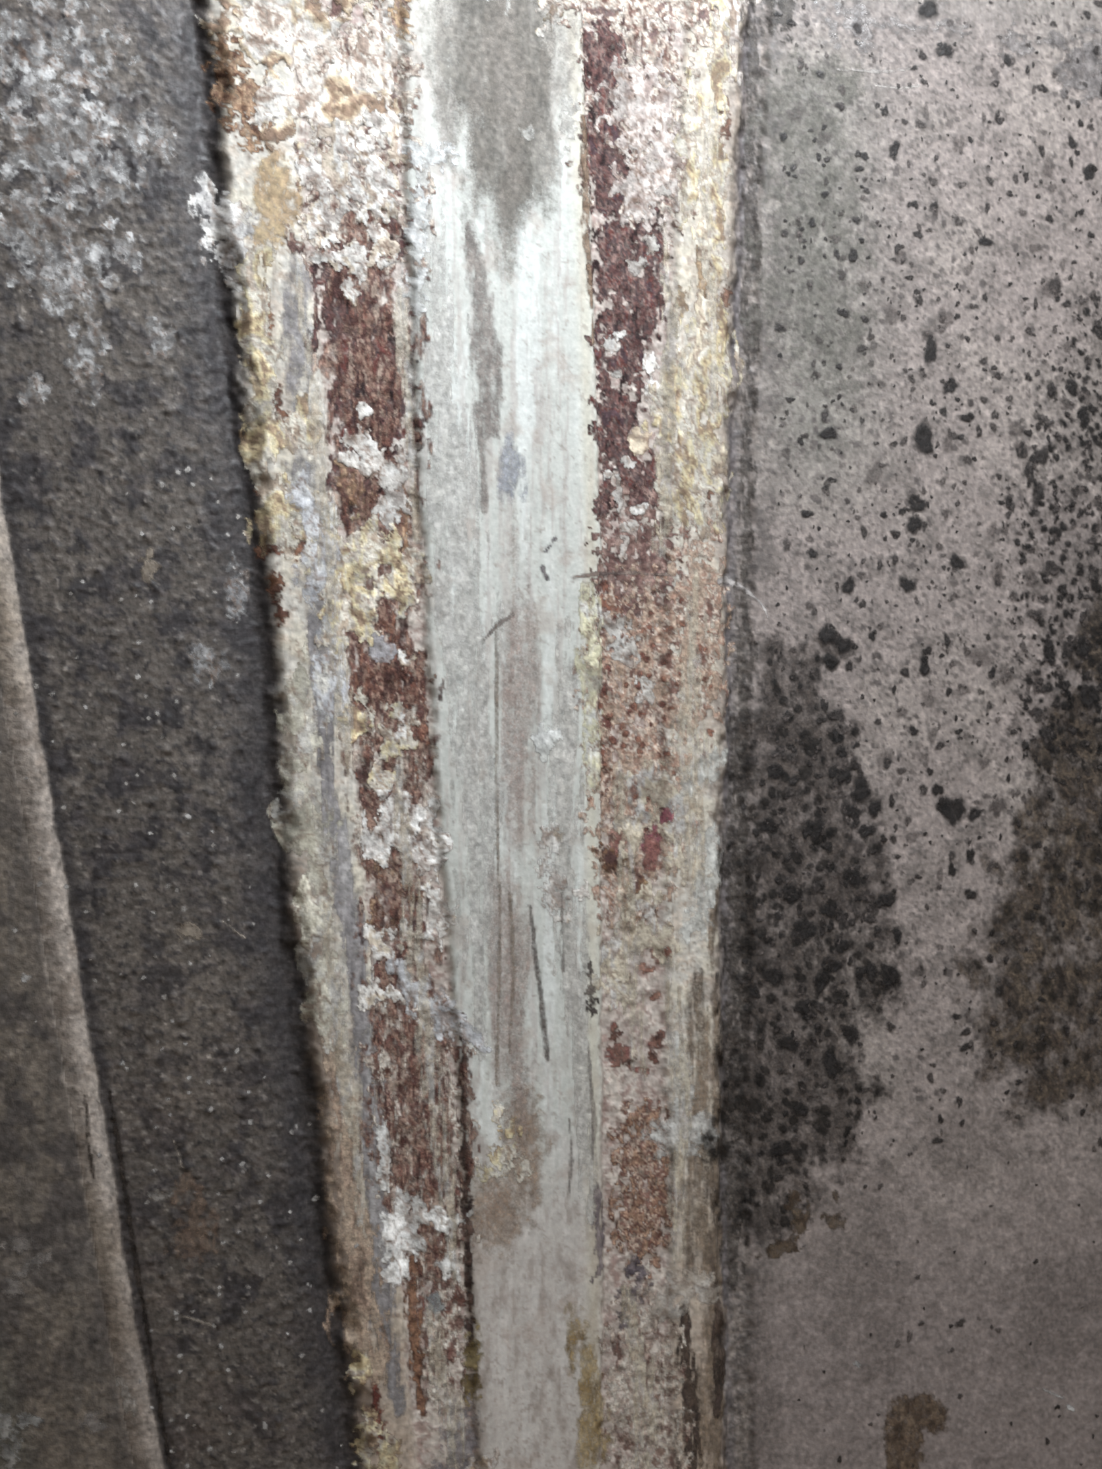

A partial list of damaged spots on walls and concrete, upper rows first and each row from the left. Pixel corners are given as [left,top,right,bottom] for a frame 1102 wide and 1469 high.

peeling [188,0,492,1055]
rust [201,0,552,1469]
peeling [376,1121,473,1287]
leakage [395,0,578,1061]
rust [584,961,599,1017]
peeling [575,582,656,788]
rust [605,1022,665,1076]
peeling [591,759,698,1014]
rust [555,0,735,943]
leakage [622,0,972,1469]
leakage [954,281,1102,1122]
leakage [997,22,1102,105]